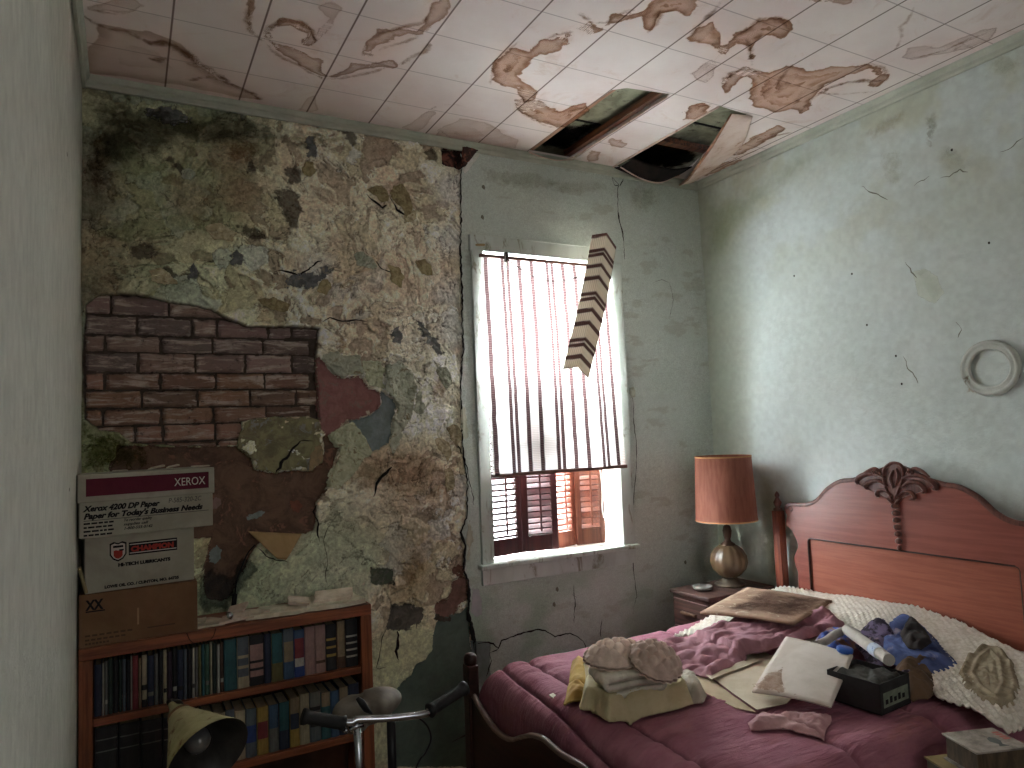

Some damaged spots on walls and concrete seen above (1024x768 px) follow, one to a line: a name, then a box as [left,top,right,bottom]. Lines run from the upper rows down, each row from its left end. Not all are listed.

peeling [274,136,317,228]
peeling [367,184,416,223]
flaking render [424,146,480,174]
crack [612,177,625,259]
peeling [230,250,244,266]
peeling [285,265,334,295]
peeling [415,259,433,276]
peeling [417,321,452,389]
flaking render [86,295,426,600]
peeling [435,424,462,492]
crack [454,153,602,676]
crack [630,398,638,501]